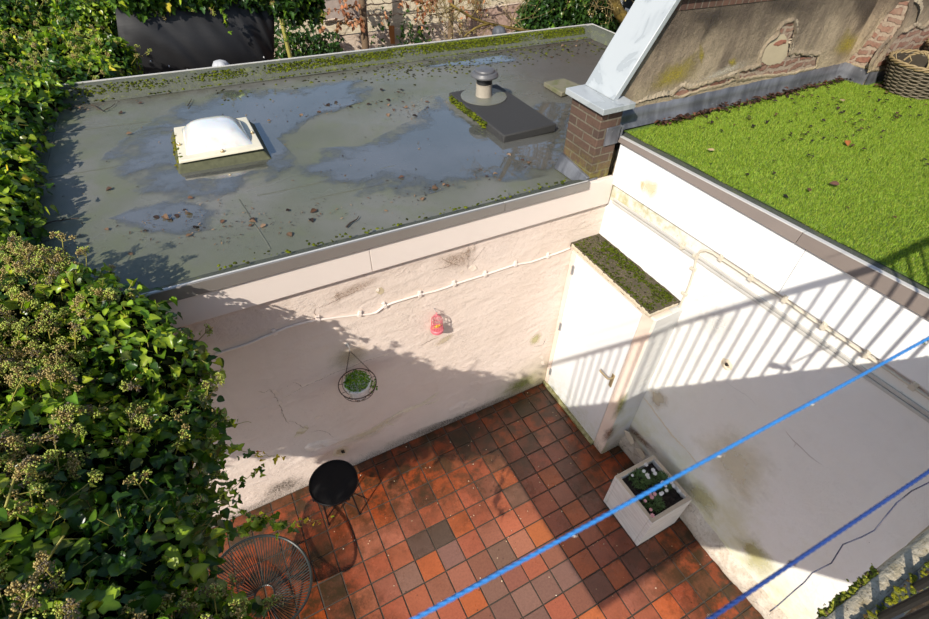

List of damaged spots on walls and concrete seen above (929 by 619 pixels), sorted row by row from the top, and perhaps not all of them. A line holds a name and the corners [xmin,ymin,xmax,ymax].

flaking render [670,17,821,99]
flaking render [845,0,929,73]